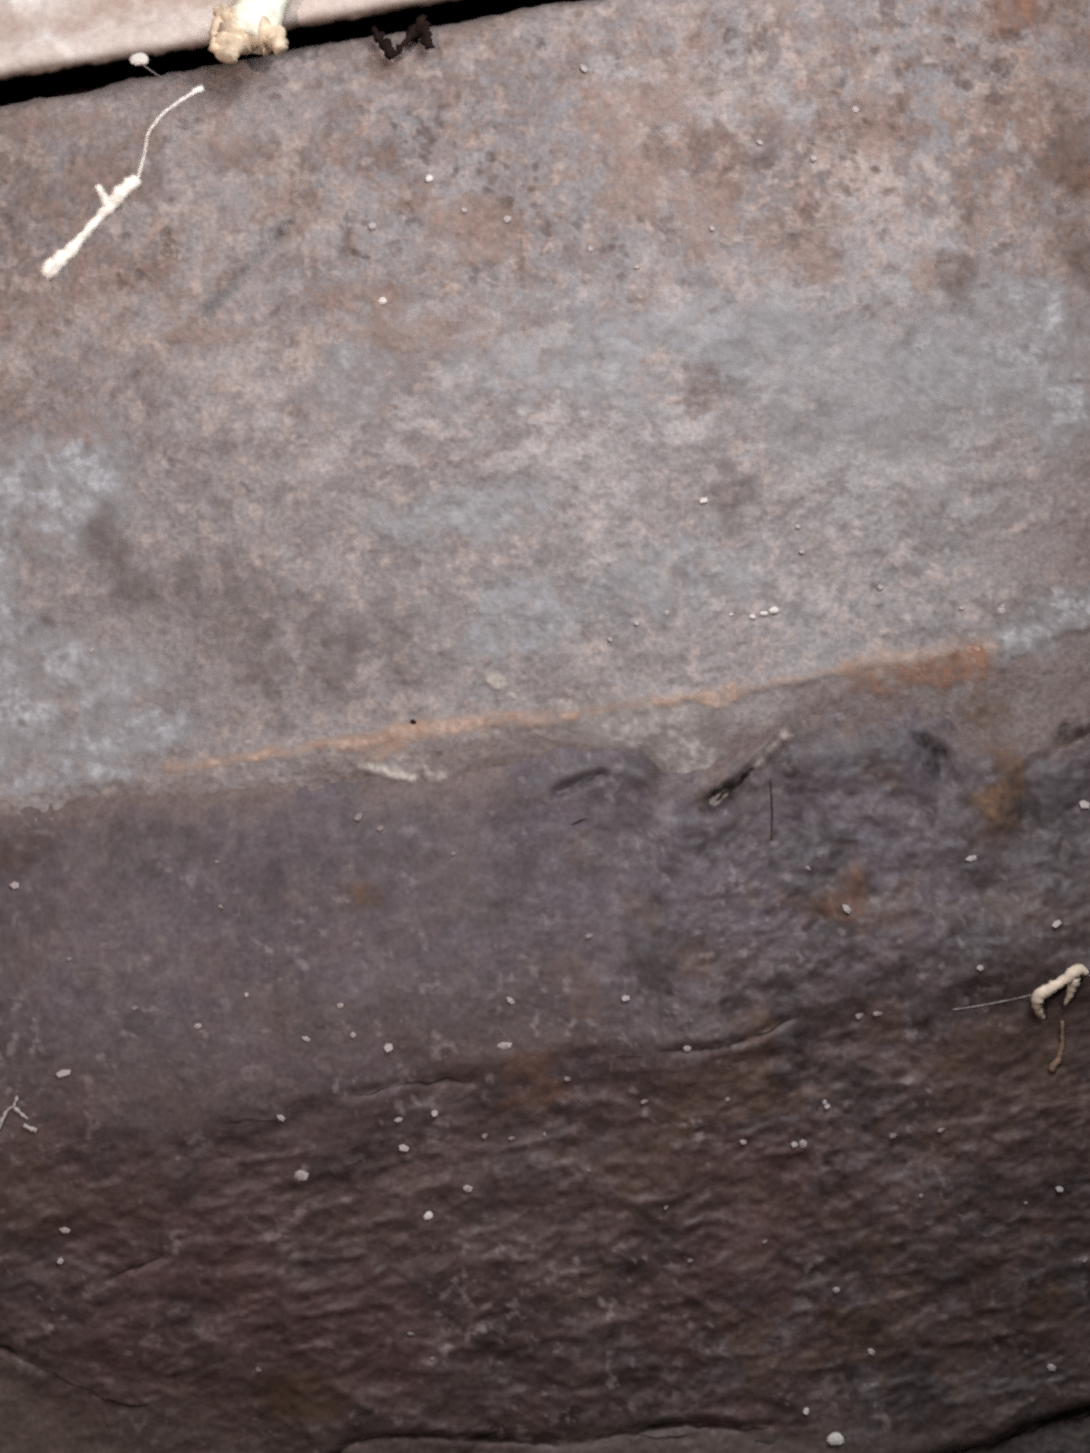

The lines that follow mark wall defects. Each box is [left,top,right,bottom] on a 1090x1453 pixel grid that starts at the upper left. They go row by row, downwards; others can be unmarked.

corrosion [196,711,578,768]